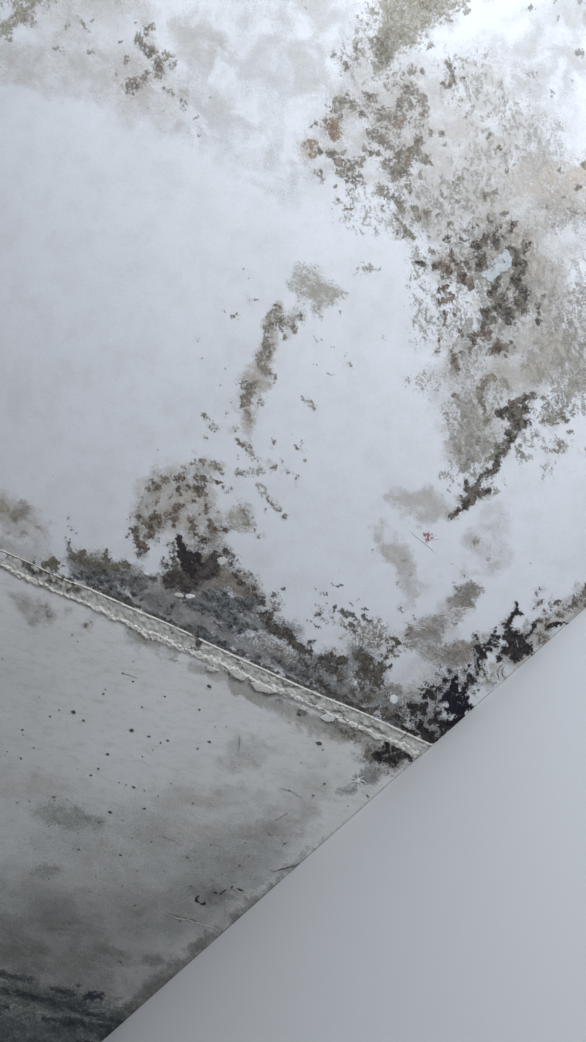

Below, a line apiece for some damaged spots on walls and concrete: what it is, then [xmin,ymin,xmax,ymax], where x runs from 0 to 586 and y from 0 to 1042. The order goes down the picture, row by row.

leakage [0,0,113,80]
leakage [53,21,251,131]
leakage [230,0,586,521]
leakage [0,269,586,798]
leakage [0,902,217,1039]